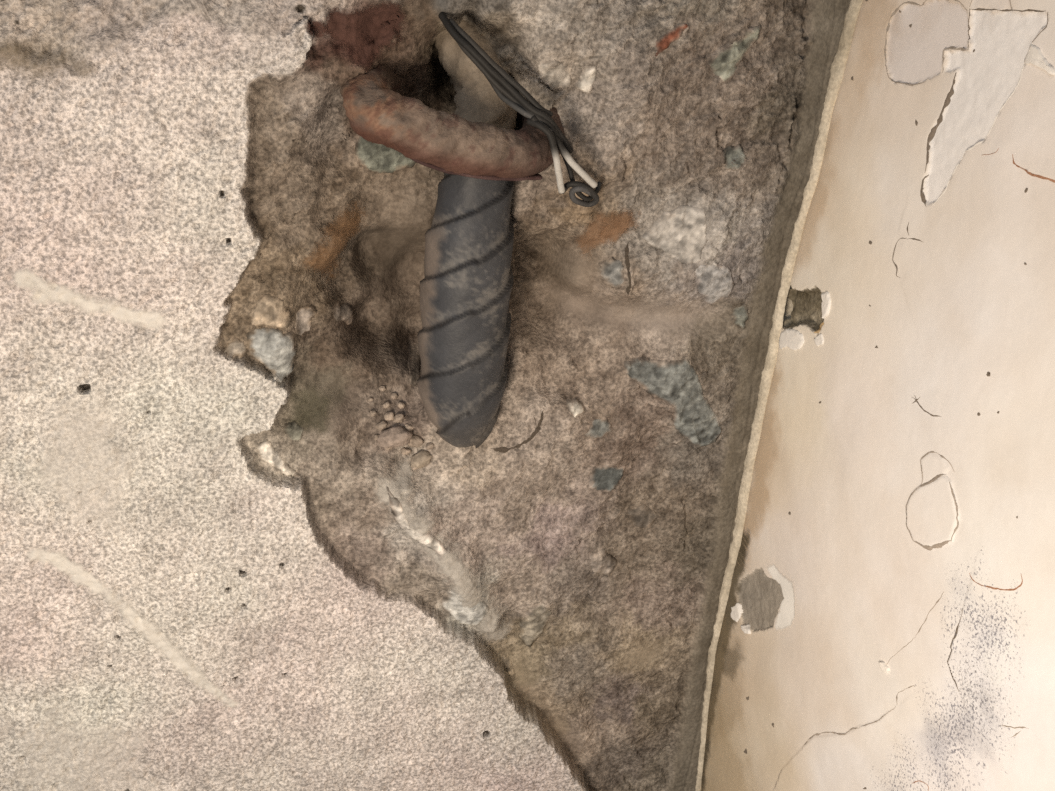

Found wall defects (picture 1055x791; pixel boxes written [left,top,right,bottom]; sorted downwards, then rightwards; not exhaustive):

rust [307,3,404,68]
peeling [884,0,1055,206]
spalling [0,0,817,791]
spalling [695,0,863,791]
crack [801,685,914,751]
crack [886,592,963,691]
water stain [875,566,1024,791]
crack [969,573,1023,591]